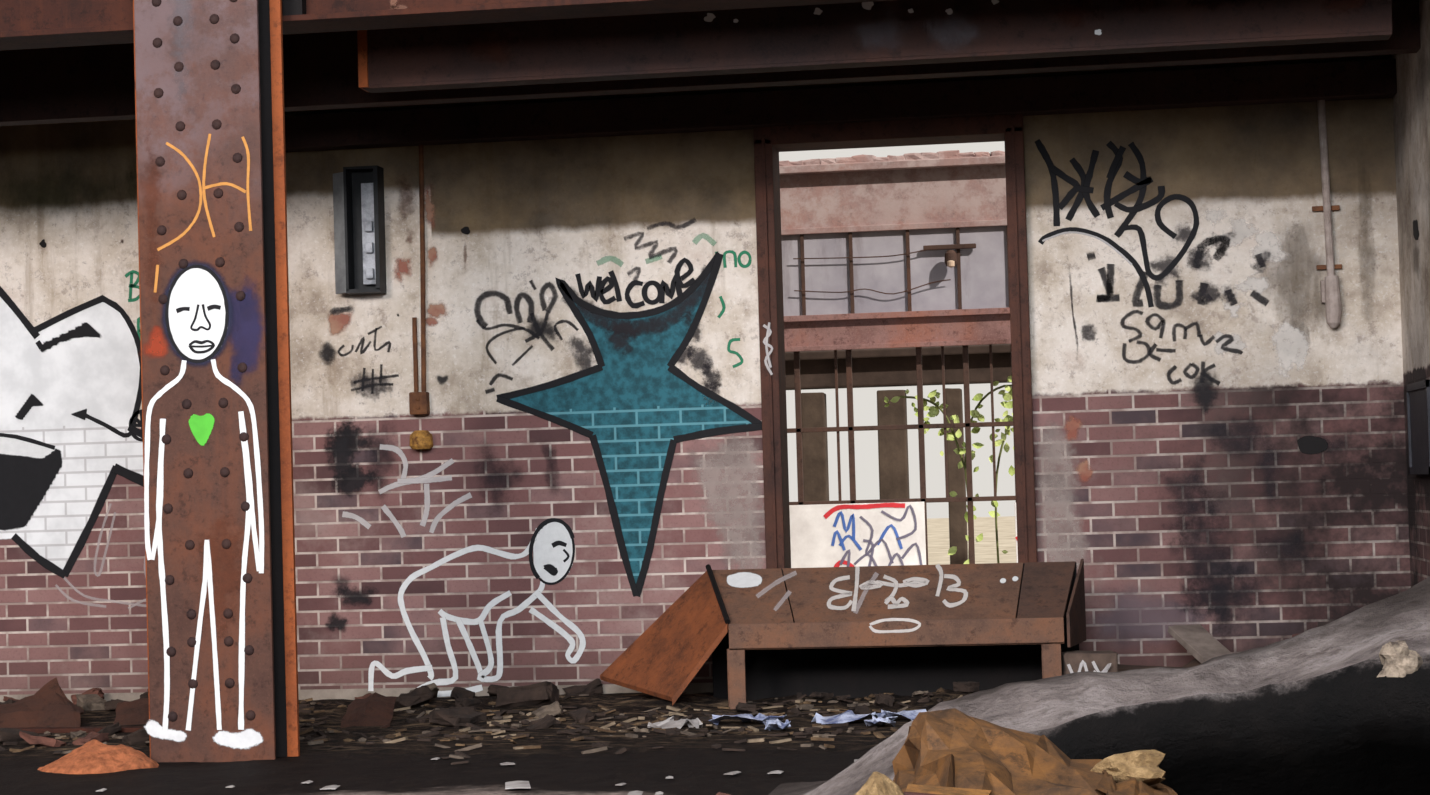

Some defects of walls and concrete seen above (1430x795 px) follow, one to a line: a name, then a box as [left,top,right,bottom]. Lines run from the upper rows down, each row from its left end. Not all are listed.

corrosion [210,524,241,613]